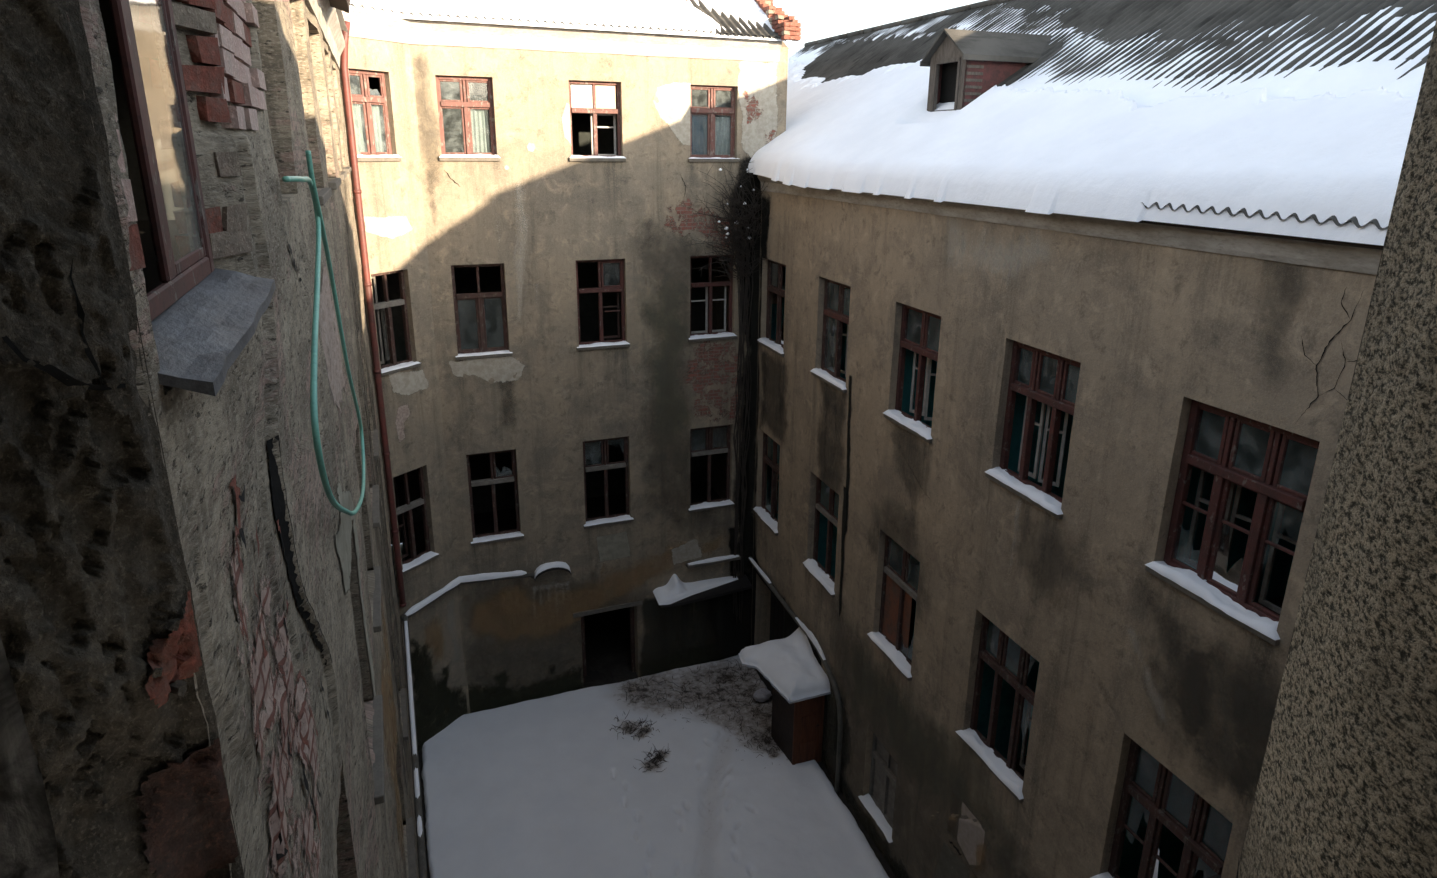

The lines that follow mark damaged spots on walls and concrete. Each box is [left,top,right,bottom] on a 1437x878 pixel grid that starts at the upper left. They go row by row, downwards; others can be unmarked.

flaking render [139,0,267,131]
peeling [653,82,691,145]
peeling [737,61,778,158]
damp [344,184,449,774]
damp [640,157,821,667]
damp [818,375,852,616]
crack [1297,287,1363,421]
spalling [145,591,202,708]
spalling [135,738,239,878]
peeling [230,474,322,878]
damp [822,638,1016,878]
damp [1154,611,1280,795]